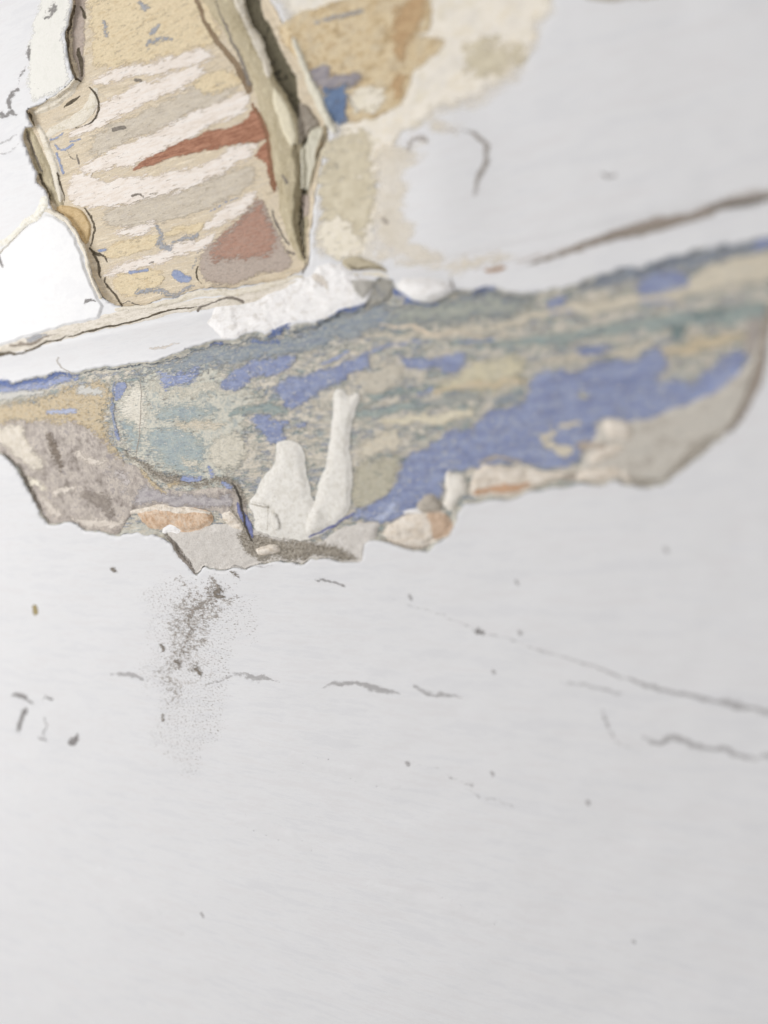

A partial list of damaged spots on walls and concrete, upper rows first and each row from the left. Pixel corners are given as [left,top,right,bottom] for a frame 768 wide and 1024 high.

peeling [0,0,768,575]
crack [407,130,489,188]